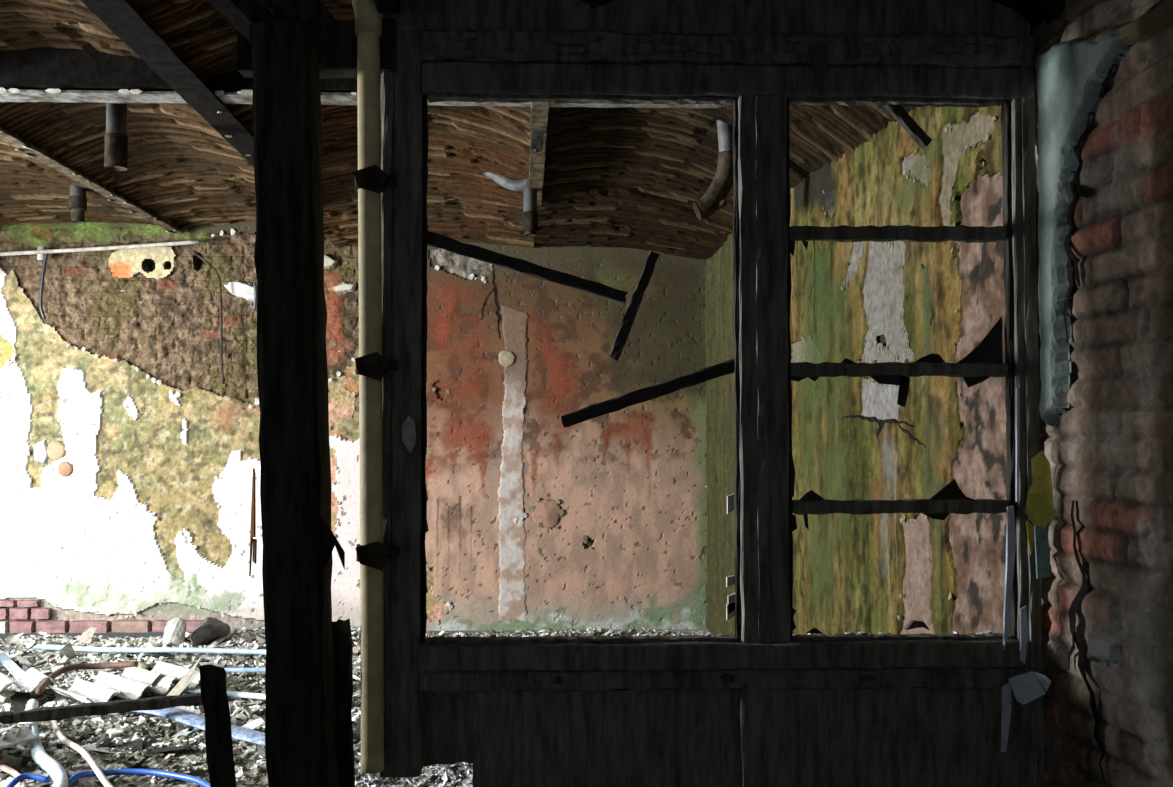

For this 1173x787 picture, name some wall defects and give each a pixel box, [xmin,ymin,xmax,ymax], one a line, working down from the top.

peeling [898,112,1003,227]
spalling [0,217,260,582]
spalling [320,235,359,571]
peeling [791,335,822,363]
peeling [841,241,914,363]
peeling [859,377,900,421]
spalling [948,241,1006,363]
spalling [946,377,1007,635]
spalling [0,598,265,633]
peeling [897,513,935,634]
crack [1068,500,1106,783]